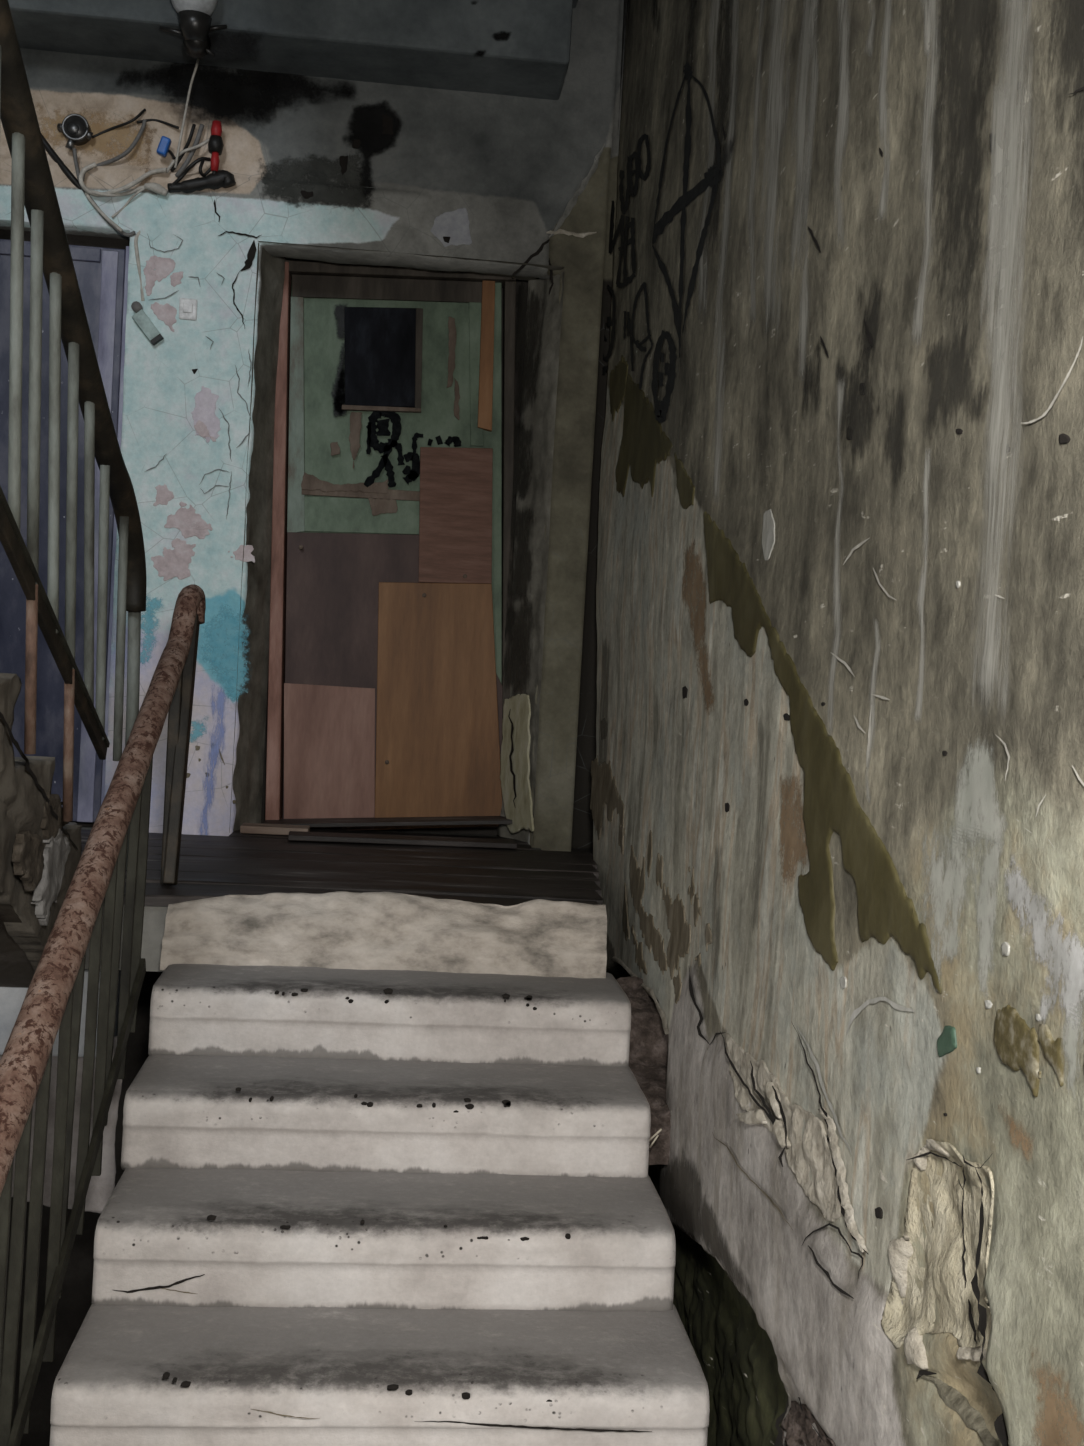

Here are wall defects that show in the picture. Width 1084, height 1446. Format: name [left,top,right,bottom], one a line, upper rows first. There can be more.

leakage [261,101,401,209]
leakage [683,0,738,496]
leakage [748,0,903,731]
leakage [914,0,1028,718]
spalling [12,791,71,926]
flaking render [500,694,534,833]
crack [689,968,726,1045]
peeling [609,355,942,994]
flaking render [985,858,1084,1097]
crack [712,1021,868,1299]
crack [114,1274,205,1294]
spalling [774,1397,836,1446]